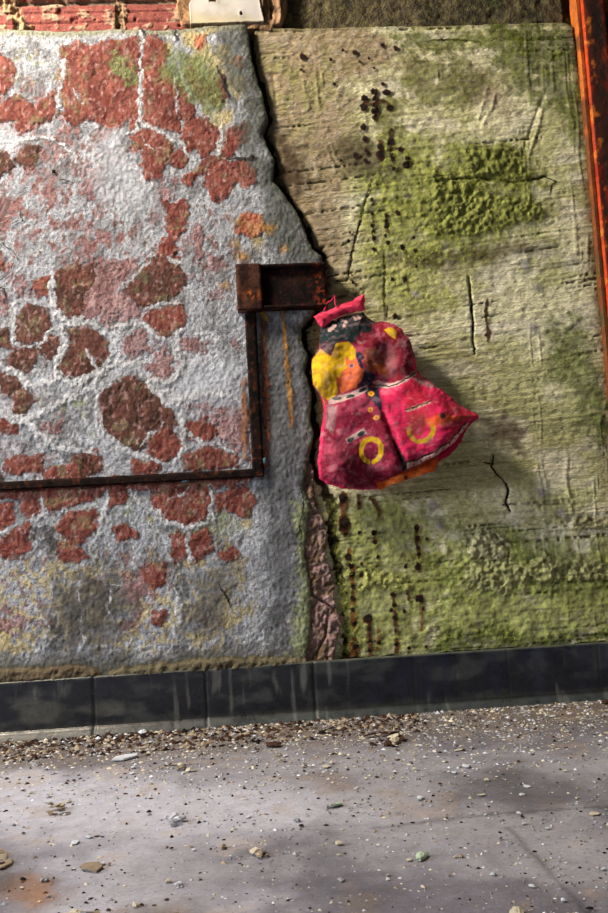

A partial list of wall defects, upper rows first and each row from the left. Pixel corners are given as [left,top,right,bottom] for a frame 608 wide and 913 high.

flaking render [245,0,288,35]
peeling [233,211,269,239]
crack [228,39,373,279]
leakage [337,22,585,327]
peeling [0,33,258,637]
crack [469,277,491,354]
flaking render [0,460,344,683]
crack [284,310,395,659]
corrosion [338,491,381,559]
corrosion [345,548,381,657]
corrosion [389,590,425,654]
leakage [332,495,608,657]